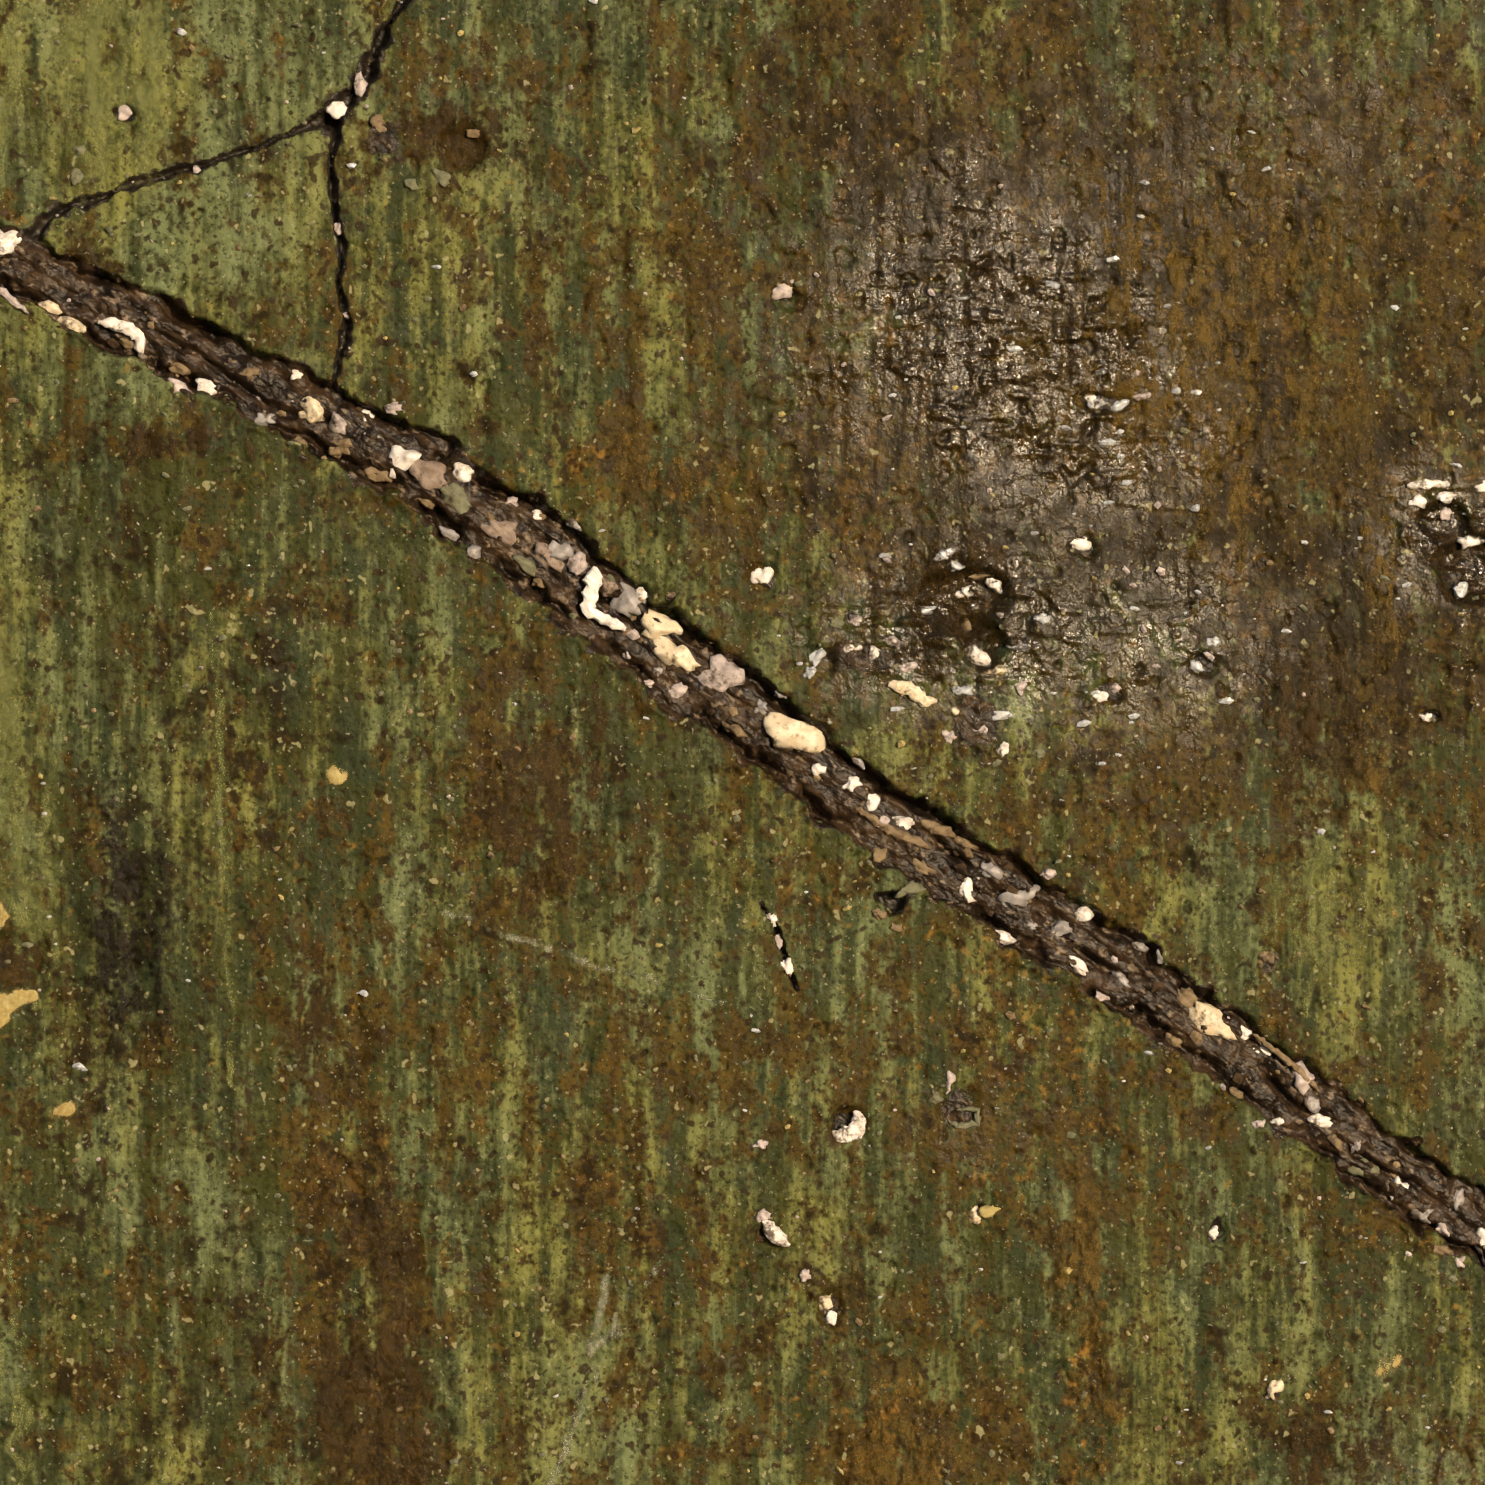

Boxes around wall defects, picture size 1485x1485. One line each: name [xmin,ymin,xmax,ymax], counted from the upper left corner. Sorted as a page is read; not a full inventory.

crack [318,0,415,136]
rust [419,39,511,174]
damp [873,145,1151,457]
rust [1036,132,1402,615]
rust [883,528,1017,647]
damp [1417,501,1485,627]
crack [0,108,1485,1271]
damp [873,558,1068,787]
rust [485,660,610,934]
rust [0,933,44,989]
rust [283,949,336,1074]
rust [1285,1401,1369,1485]